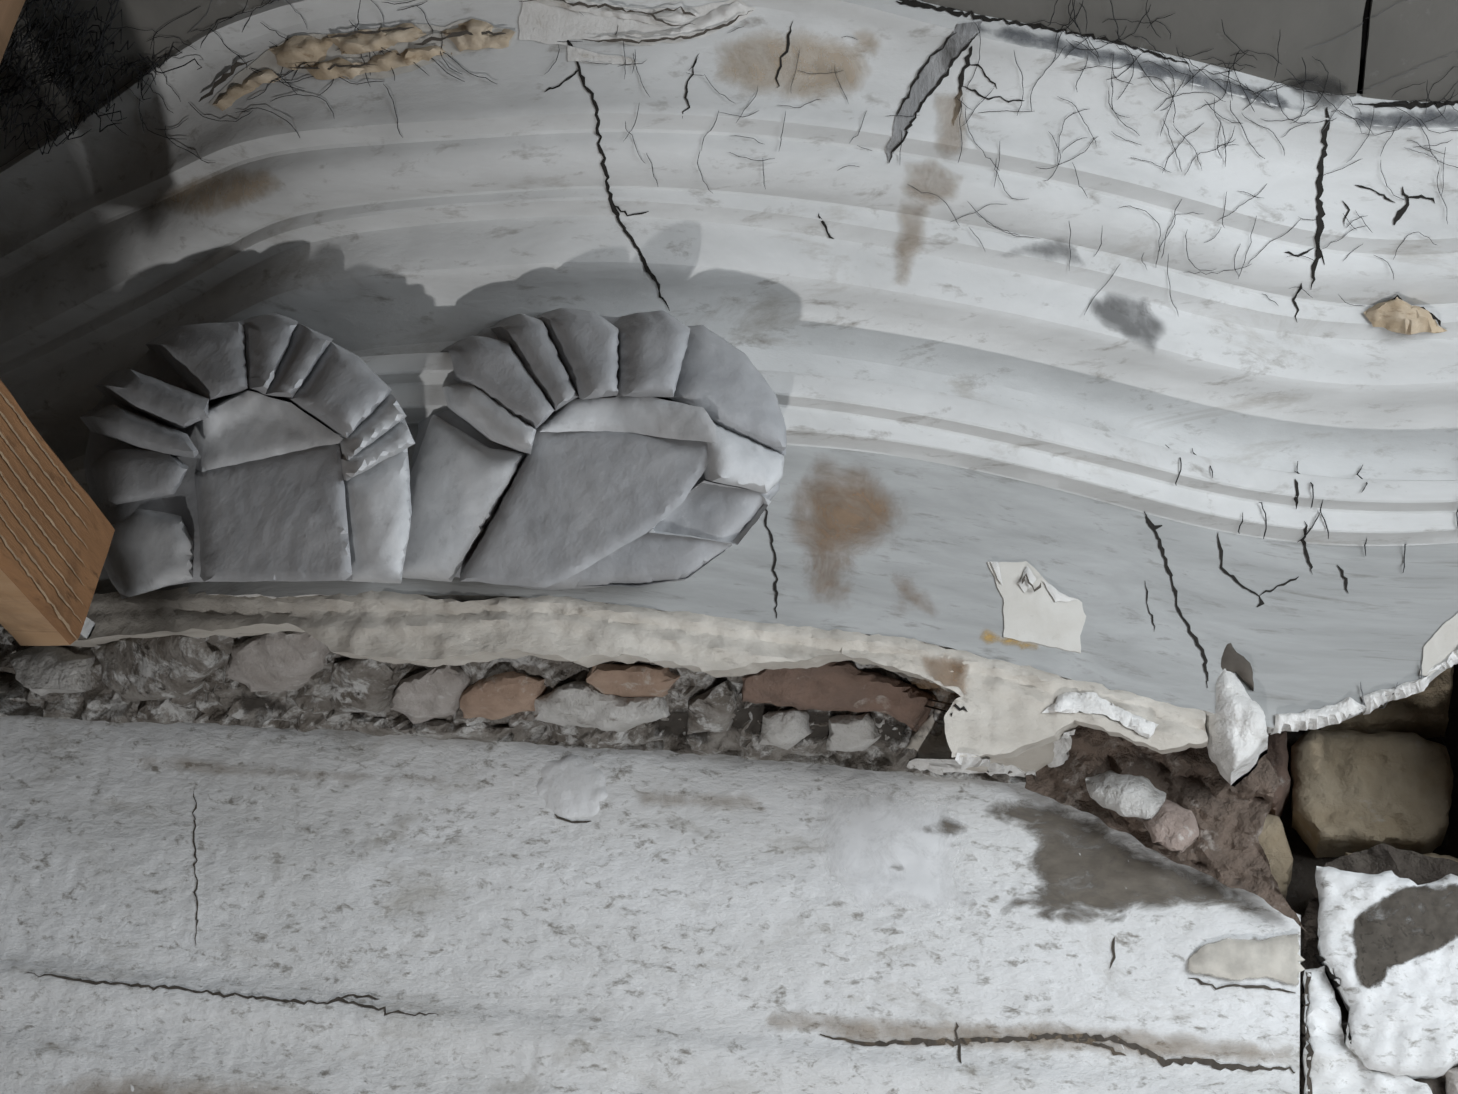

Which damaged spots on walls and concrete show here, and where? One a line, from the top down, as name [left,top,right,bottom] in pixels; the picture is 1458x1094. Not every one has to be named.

peeling [199,0,756,111]
leakage [732,42,856,91]
crack [896,0,1188,126]
crack [545,40,670,311]
crack [1285,100,1458,322]
peeling [1363,295,1447,335]
peeling [987,561,1086,653]
crack [1144,512,1208,688]
spalling [906,692,1159,777]
spalling [1270,613,1458,735]
leakage [991,804,1252,922]
crack [820,933,1352,1094]